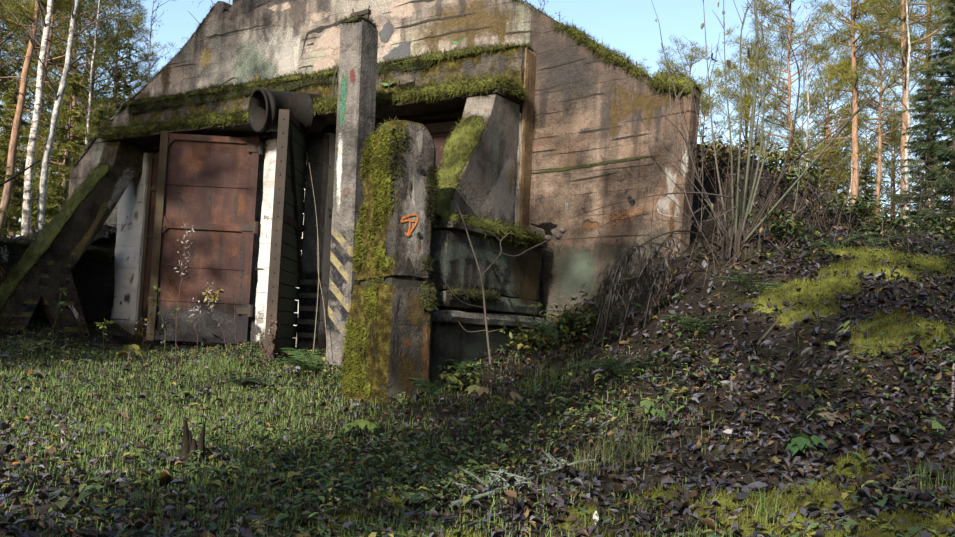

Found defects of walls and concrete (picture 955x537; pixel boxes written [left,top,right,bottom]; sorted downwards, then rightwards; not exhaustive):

water stain [234,0,295,14]
water stain [334,0,394,16]
water stain [197,29,300,84]